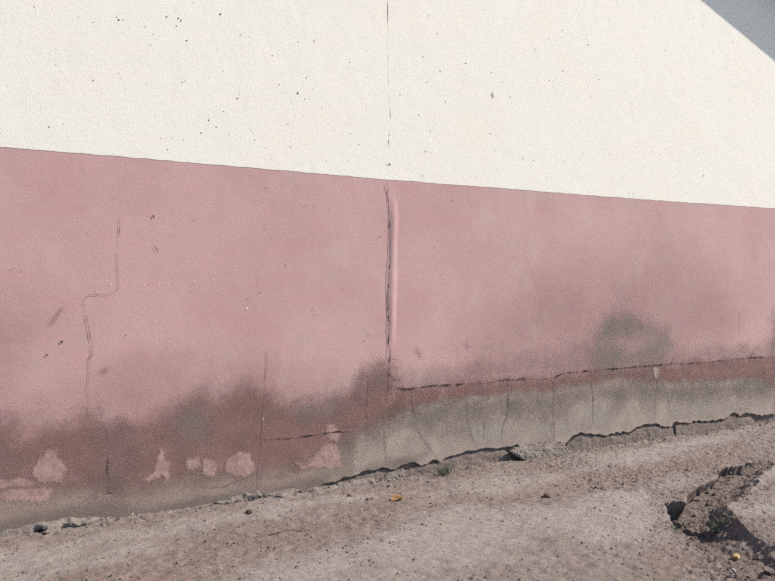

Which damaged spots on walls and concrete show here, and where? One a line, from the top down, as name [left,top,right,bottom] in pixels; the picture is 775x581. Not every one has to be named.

crack [209,347,353,489]
damp [0,345,775,489]
crack [388,338,768,458]